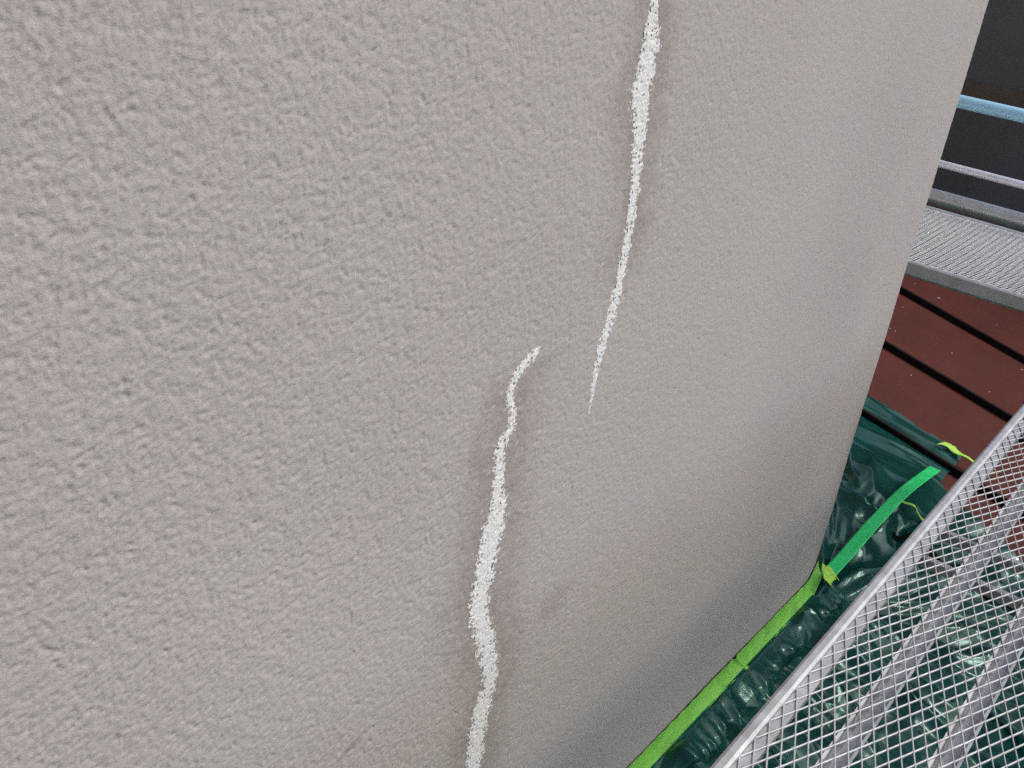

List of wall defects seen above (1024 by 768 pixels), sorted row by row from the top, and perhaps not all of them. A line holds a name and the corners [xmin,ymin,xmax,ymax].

crack [588,0,662,413]
crack [462,346,540,768]